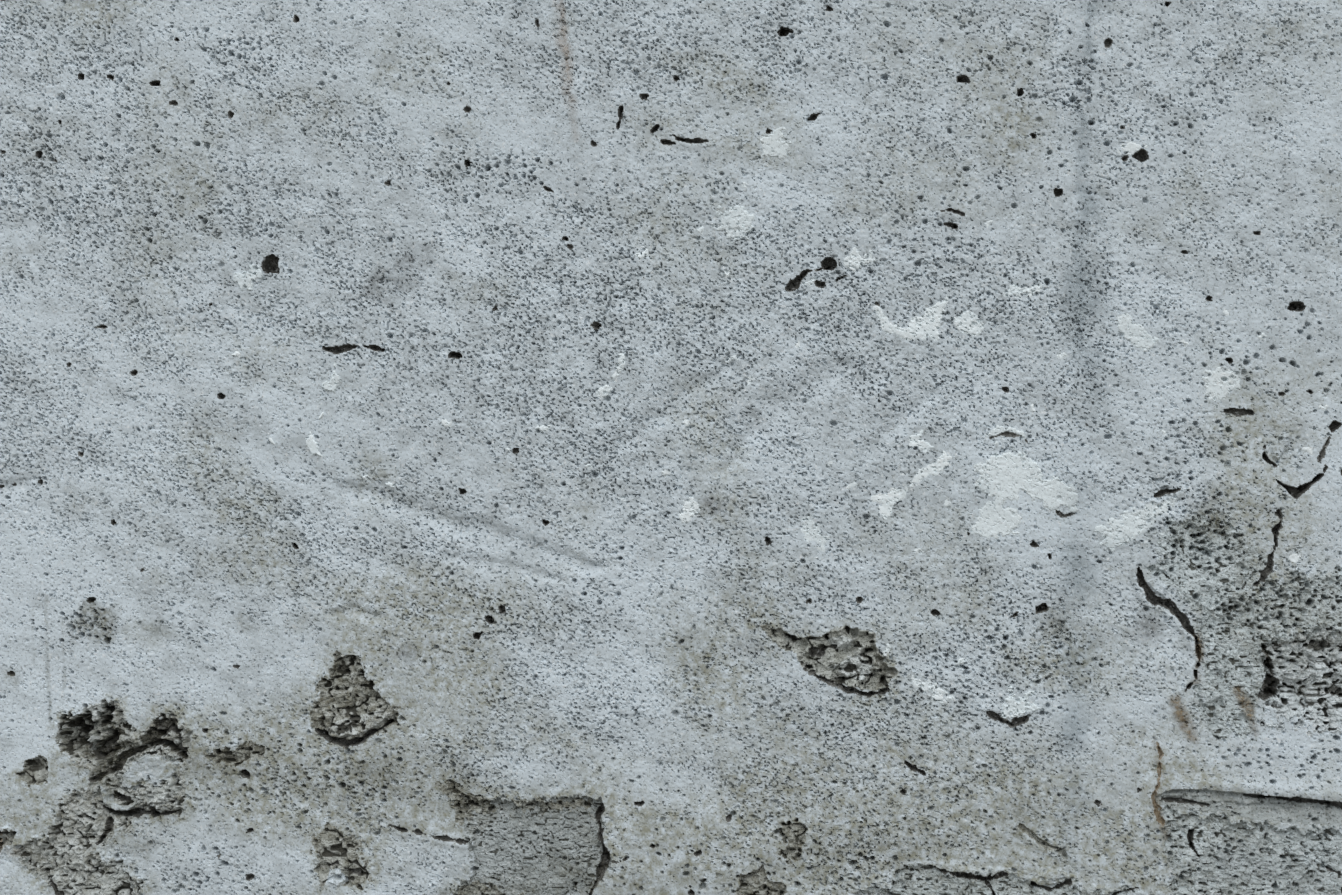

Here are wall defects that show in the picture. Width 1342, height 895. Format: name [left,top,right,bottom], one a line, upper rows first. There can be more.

crack [1253,509,1283,586]
spalling [309,650,402,749]
spalling [760,625,955,704]
crack [1136,567,1201,692]
spalling [0,698,266,895]
spalling [388,780,628,895]